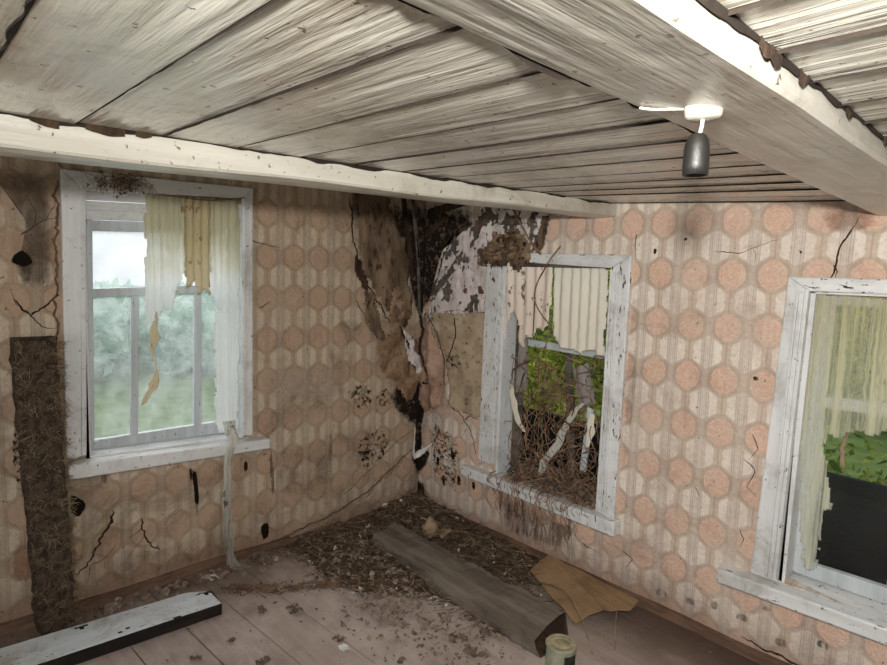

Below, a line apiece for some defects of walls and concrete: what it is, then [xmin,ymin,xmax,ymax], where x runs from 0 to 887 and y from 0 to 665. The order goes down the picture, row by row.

crack [10,162,63,336]
crack [830,216,860,278]
peeling [391,198,550,418]
water stain [351,385,460,487]
crack [74,510,160,577]
crack [740,636,798,665]